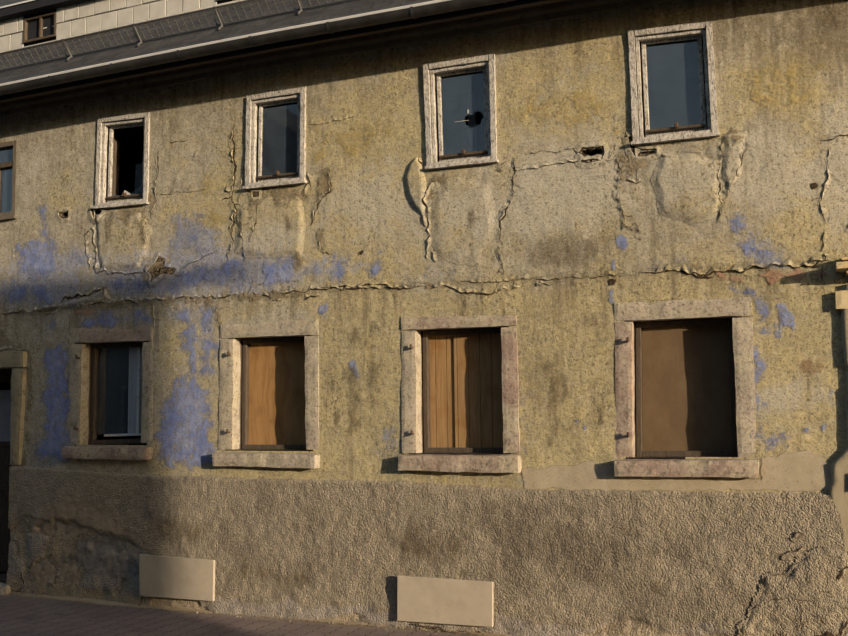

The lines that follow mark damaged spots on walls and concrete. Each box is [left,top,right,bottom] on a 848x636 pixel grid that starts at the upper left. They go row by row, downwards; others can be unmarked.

crack [0,128,848,328]